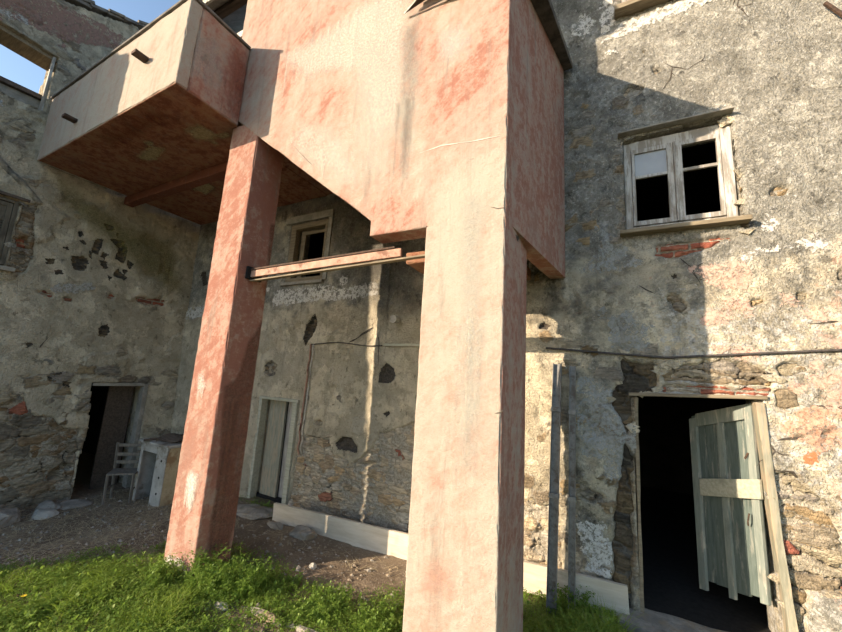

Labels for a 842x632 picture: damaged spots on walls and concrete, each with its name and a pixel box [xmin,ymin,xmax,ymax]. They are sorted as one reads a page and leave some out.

peeling [571,0,712,55]
flaking render [4,202,38,273]
spalling [63,223,134,281]
spalling [303,314,317,346]
peeling [266,276,378,307]
flaking render [667,295,687,313]
peeling [779,293,842,349]
peeling [576,344,842,630]